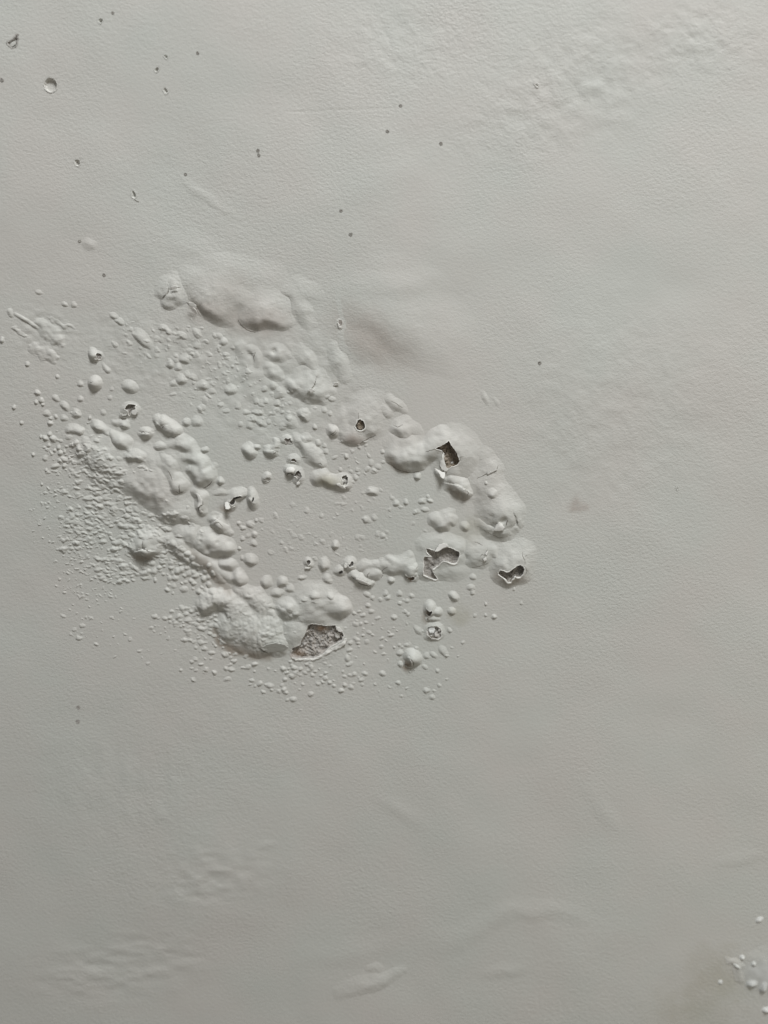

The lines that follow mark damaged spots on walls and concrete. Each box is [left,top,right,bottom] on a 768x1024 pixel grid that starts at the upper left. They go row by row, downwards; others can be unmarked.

peeling [382,422,483,479]
peeling [415,531,471,582]
peeling [488,537,537,589]
peeling [274,579,353,664]